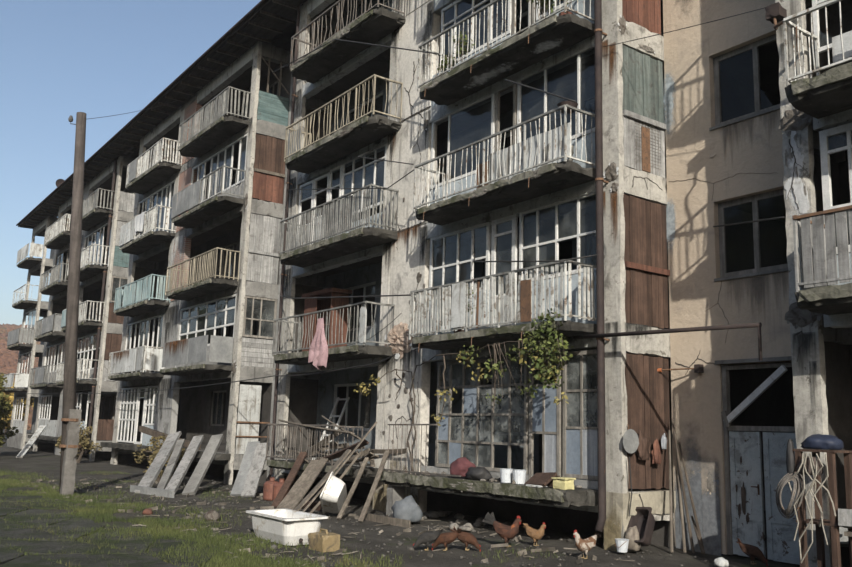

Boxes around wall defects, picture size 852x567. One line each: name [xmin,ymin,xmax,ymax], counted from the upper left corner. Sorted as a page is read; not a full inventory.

crack [400,62,431,162]
crack [632,139,804,209]
peeling [778,109,813,214]